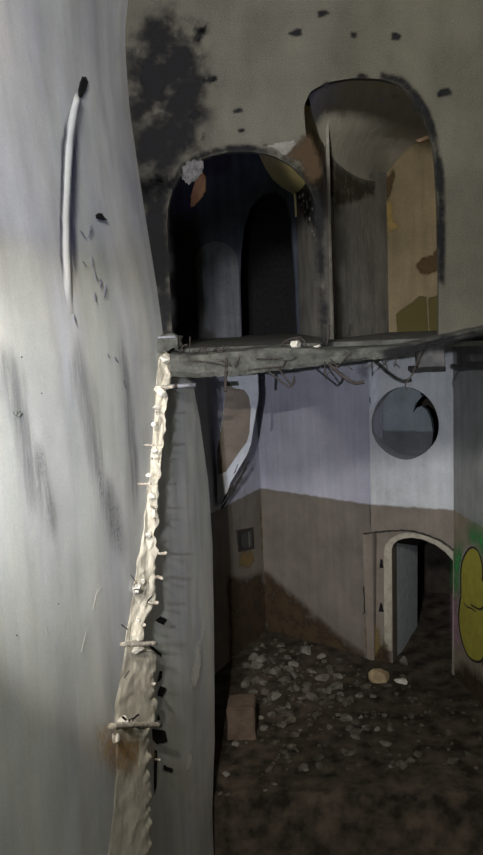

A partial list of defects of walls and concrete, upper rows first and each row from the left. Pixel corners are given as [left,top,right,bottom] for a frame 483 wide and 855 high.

spalling [108,351,174,855]